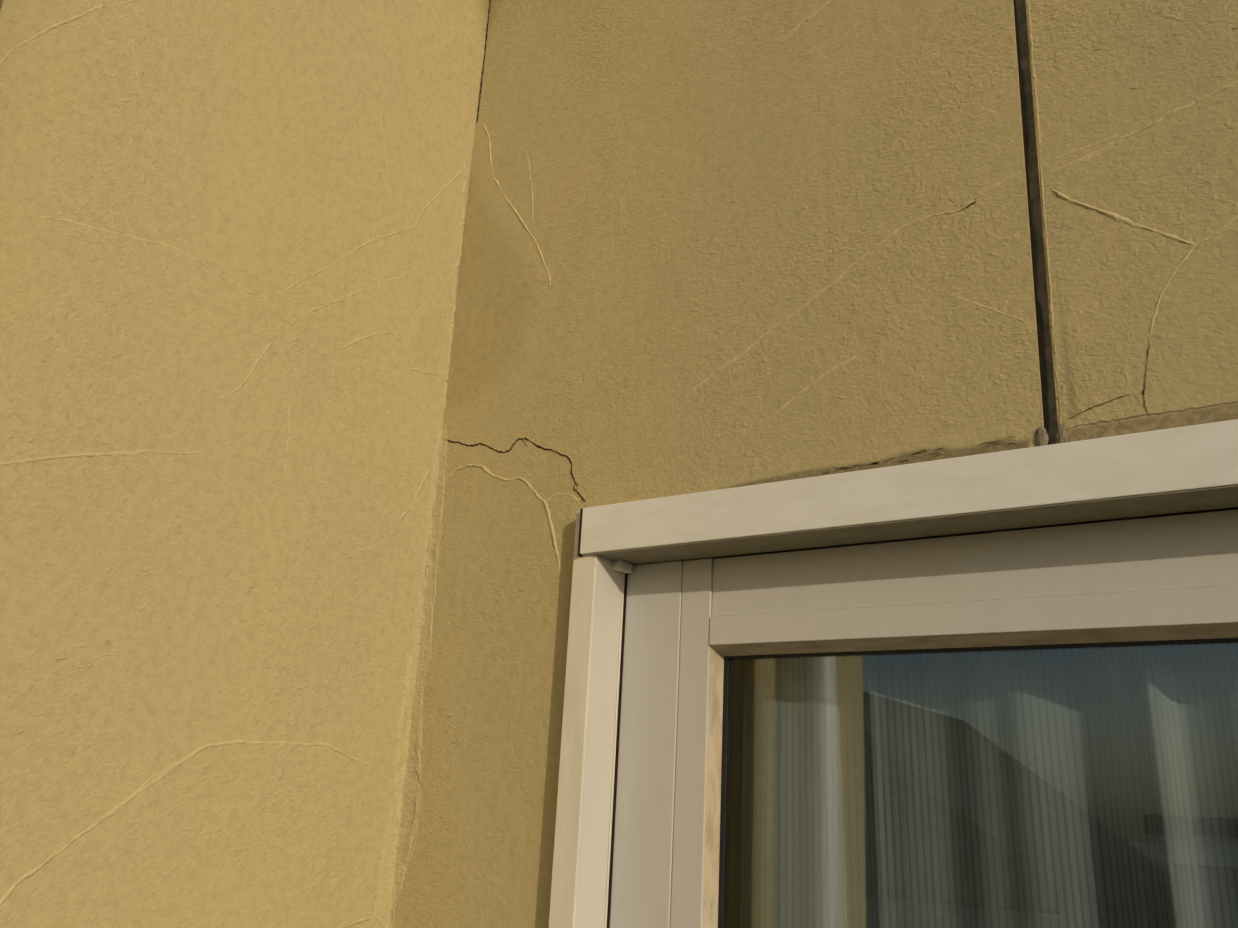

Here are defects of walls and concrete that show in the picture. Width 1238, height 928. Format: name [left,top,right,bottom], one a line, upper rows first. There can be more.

crack [685,81,1238,422]
crack [443,436,587,571]